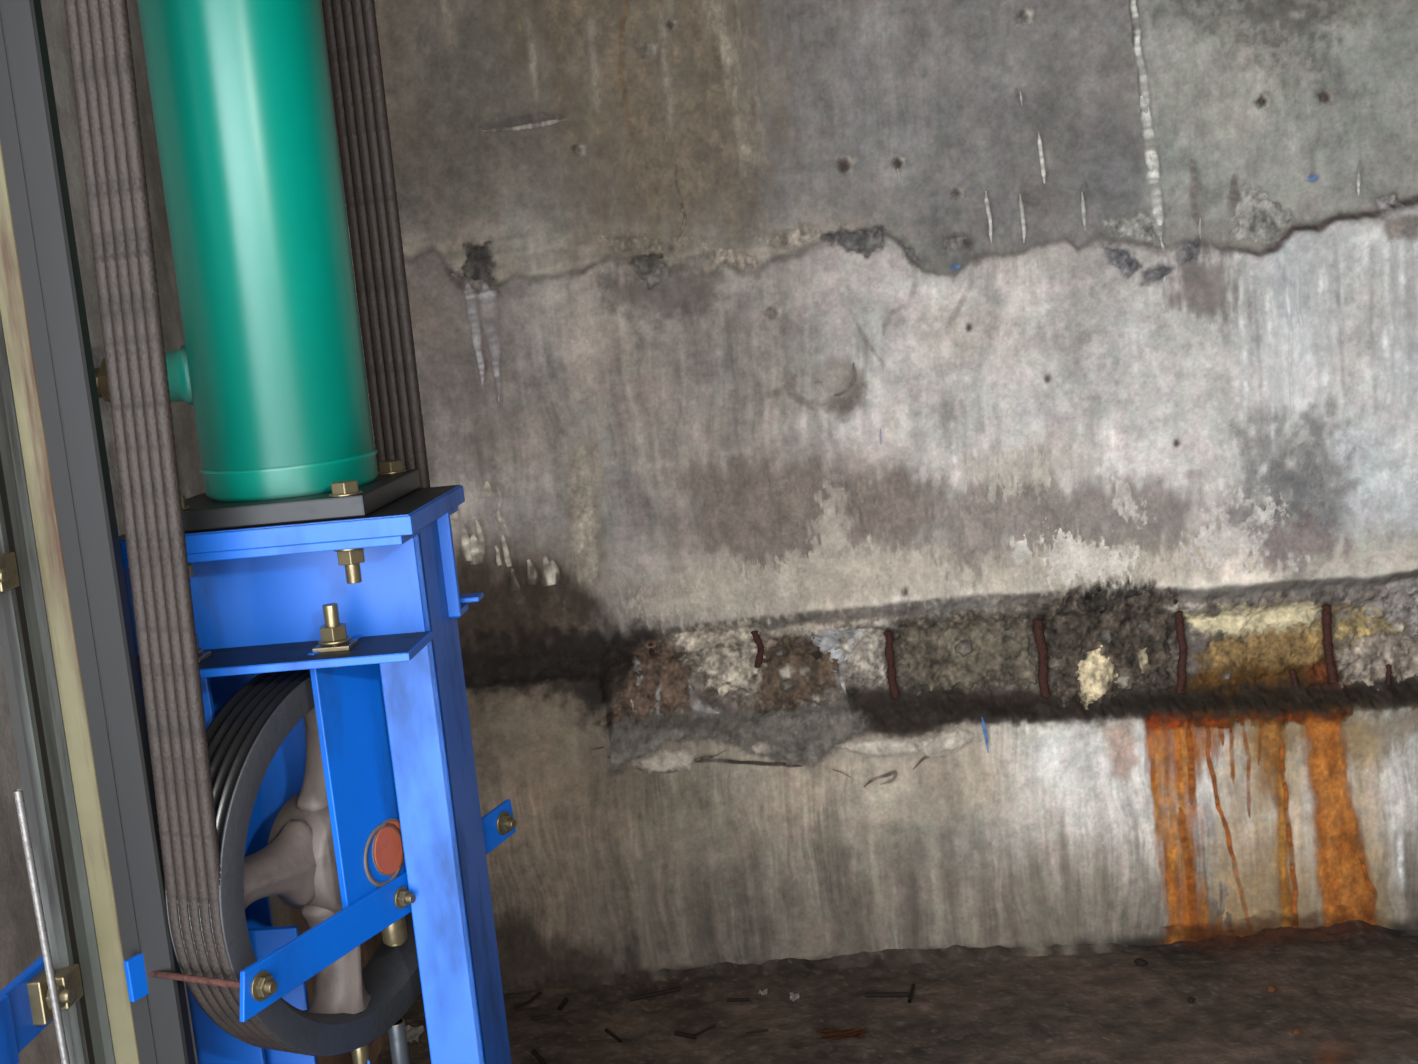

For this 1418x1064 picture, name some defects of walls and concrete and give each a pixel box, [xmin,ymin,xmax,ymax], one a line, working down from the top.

leakage [1381,217,1418,410]
leakage [1178,243,1357,579]
leakage [457,442,601,654]
leakage [691,455,1201,586]
spalling [606,447,1418,727]
leakage [630,656,643,705]
spalling [636,750,696,773]
spalling [753,740,771,754]
spalling [837,728,974,759]
corrosion [1146,612,1397,951]
leakage [367,932,382,961]